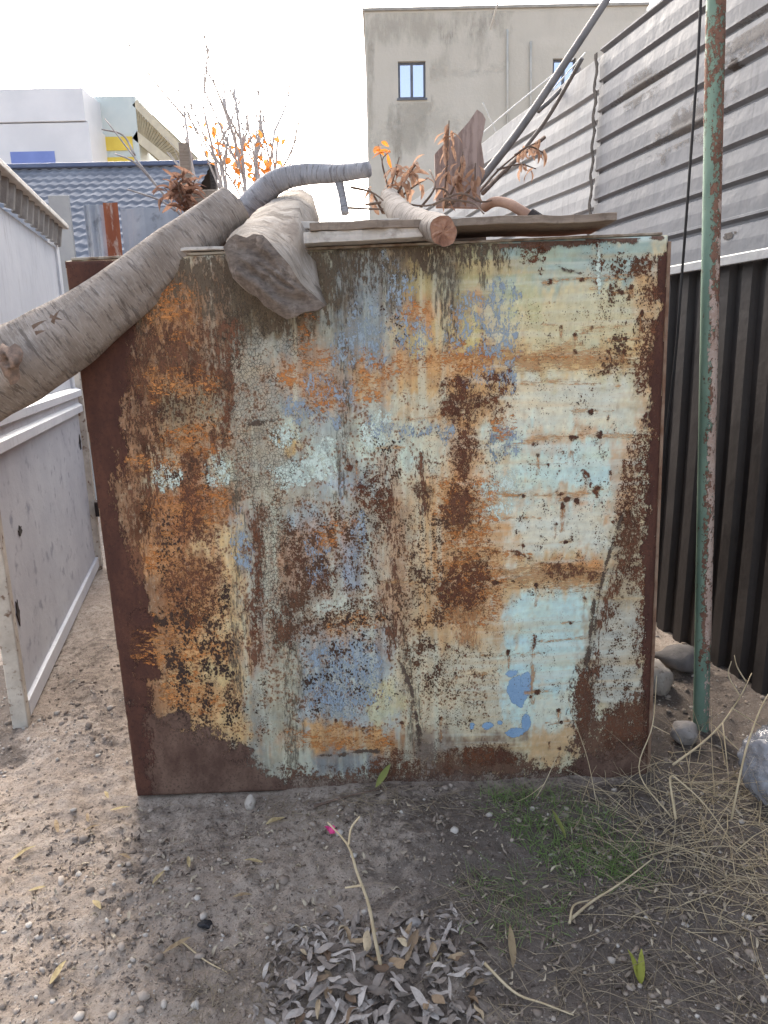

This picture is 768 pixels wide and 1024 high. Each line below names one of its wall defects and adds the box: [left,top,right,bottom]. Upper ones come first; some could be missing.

corrosion [65,260,115,290]
corrosion [80,236,668,796]
spalling [266,243,666,750]
corrosion [698,0,726,671]